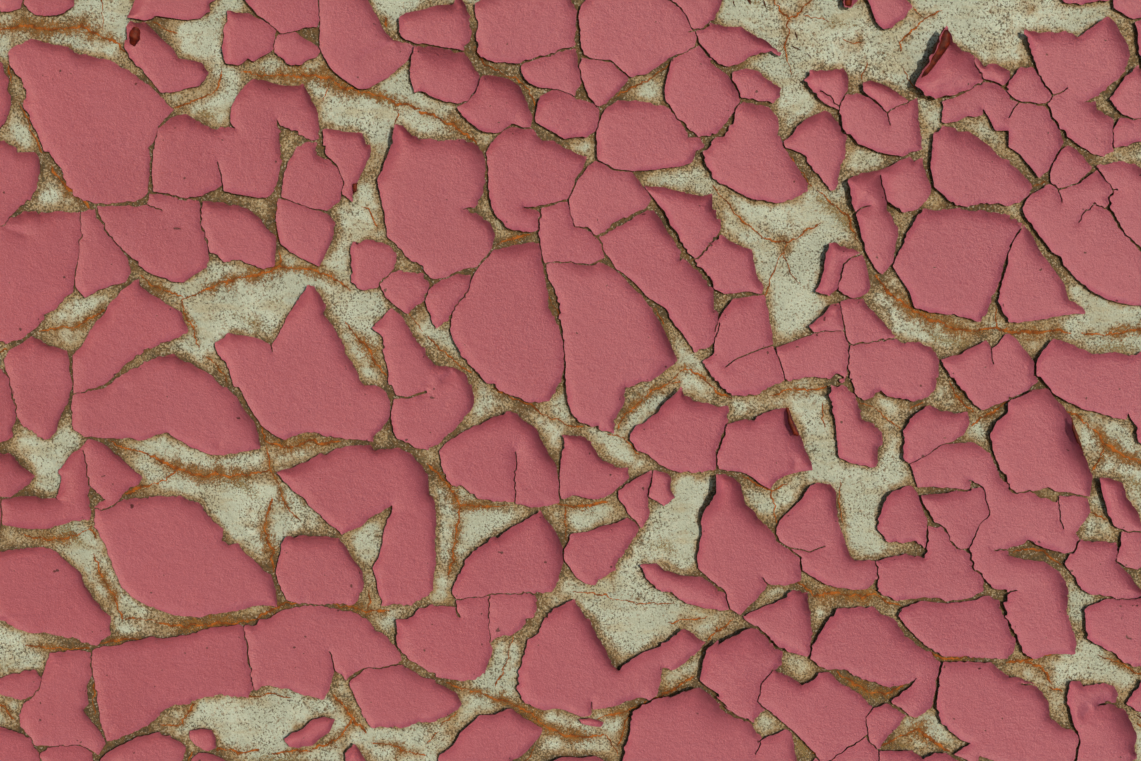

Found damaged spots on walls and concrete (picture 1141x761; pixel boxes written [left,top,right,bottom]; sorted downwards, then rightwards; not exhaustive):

crack [173,71,478,145]
crack [711,157,858,296]
peeling [0,0,371,618]
crack [108,426,341,572]
rust [156,433,334,561]
crack [409,314,732,455]
peeling [215,0,1141,667]
rust [1075,415,1141,471]
peeling [0,411,675,761]
crack [188,636,695,761]
rust [451,681,599,748]
peeling [517,590,1137,761]